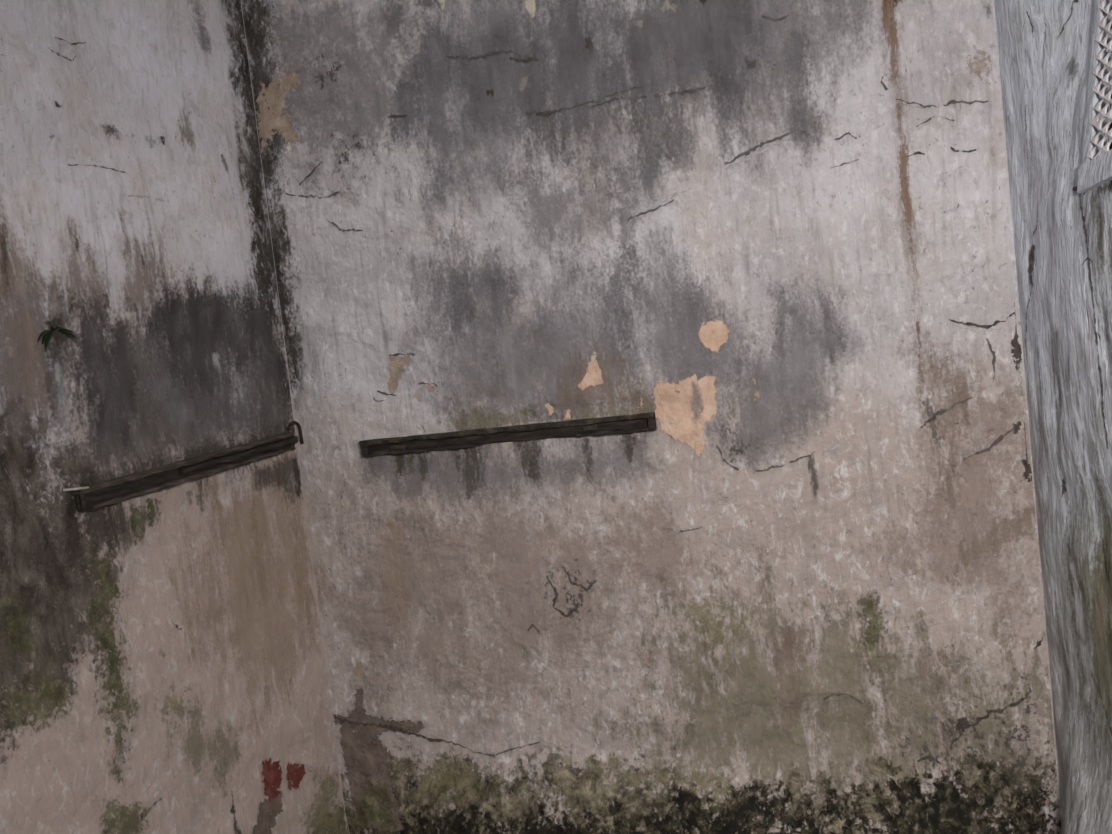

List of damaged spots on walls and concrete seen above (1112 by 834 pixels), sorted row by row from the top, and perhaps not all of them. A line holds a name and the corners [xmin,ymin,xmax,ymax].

corrosion [881,0,900,90]
peeling [256,66,307,154]
corrosion [899,133,912,249]
water stain [1093,180,1112,274]
peeling [373,353,415,402]
water stain [0,0,866,763]
peeling [544,403,571,420]
peeling [578,351,604,391]
peeling [637,372,718,457]
peeling [698,319,730,353]
water stain [891,355,1035,636]
water stain [629,568,1052,830]